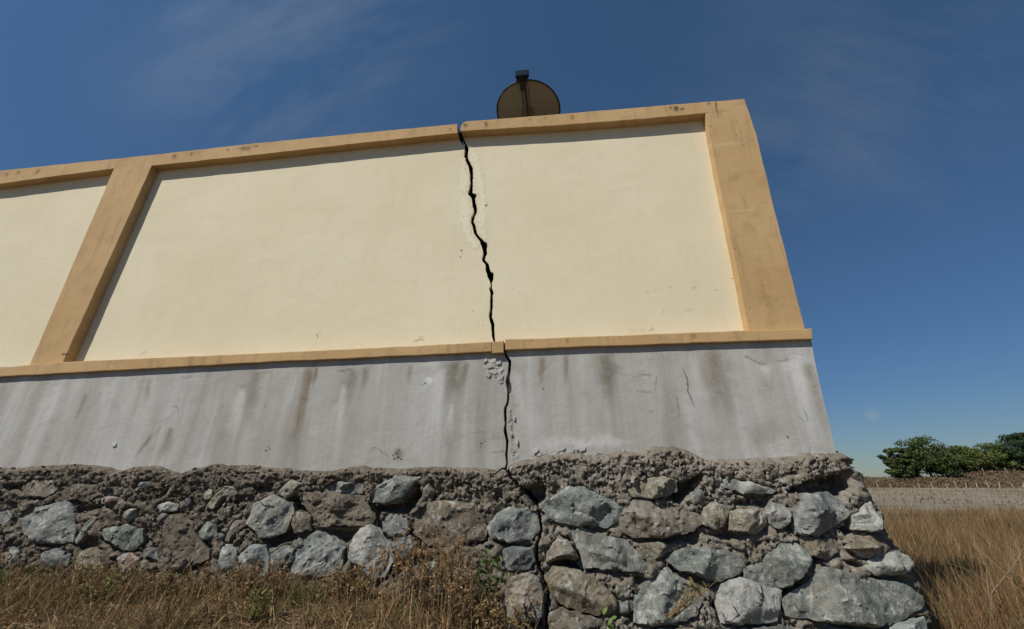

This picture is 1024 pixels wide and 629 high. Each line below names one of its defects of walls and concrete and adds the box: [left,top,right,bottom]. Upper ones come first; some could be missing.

crack [458,129,518,475]
flaking render [482,346,505,385]